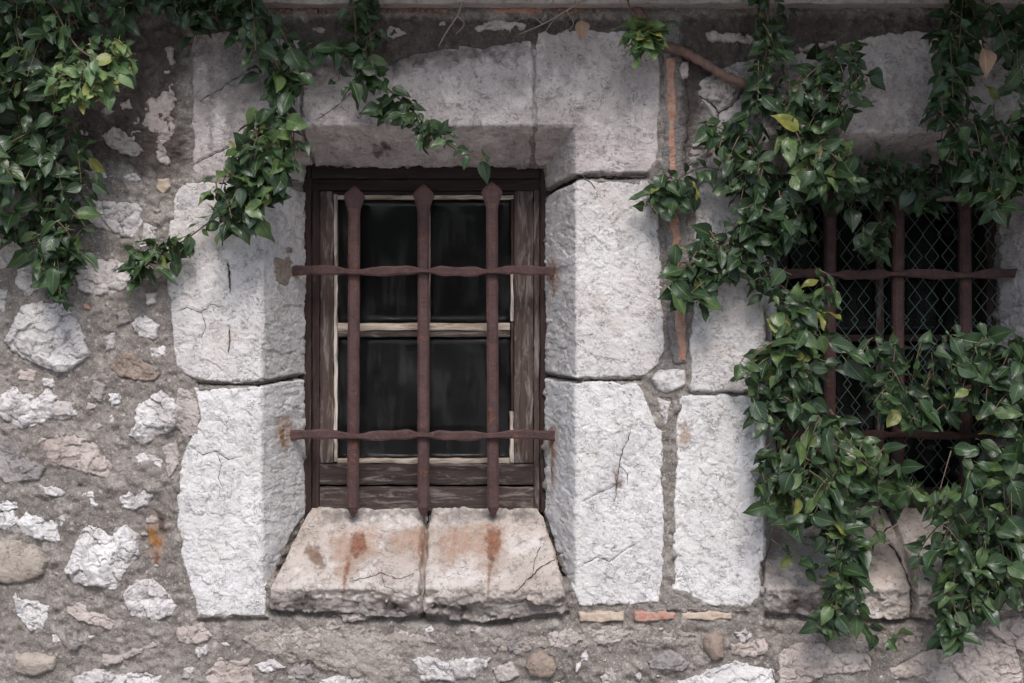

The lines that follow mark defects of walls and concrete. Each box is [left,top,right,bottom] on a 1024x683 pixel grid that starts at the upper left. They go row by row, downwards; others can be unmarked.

peeling [94,46,178,170]
crack [179,263,231,353]
crack [584,426,632,505]
spalling [141,515,159,537]
corrosion [336,530,373,583]
corrosion [442,524,501,568]
crack [515,544,636,593]